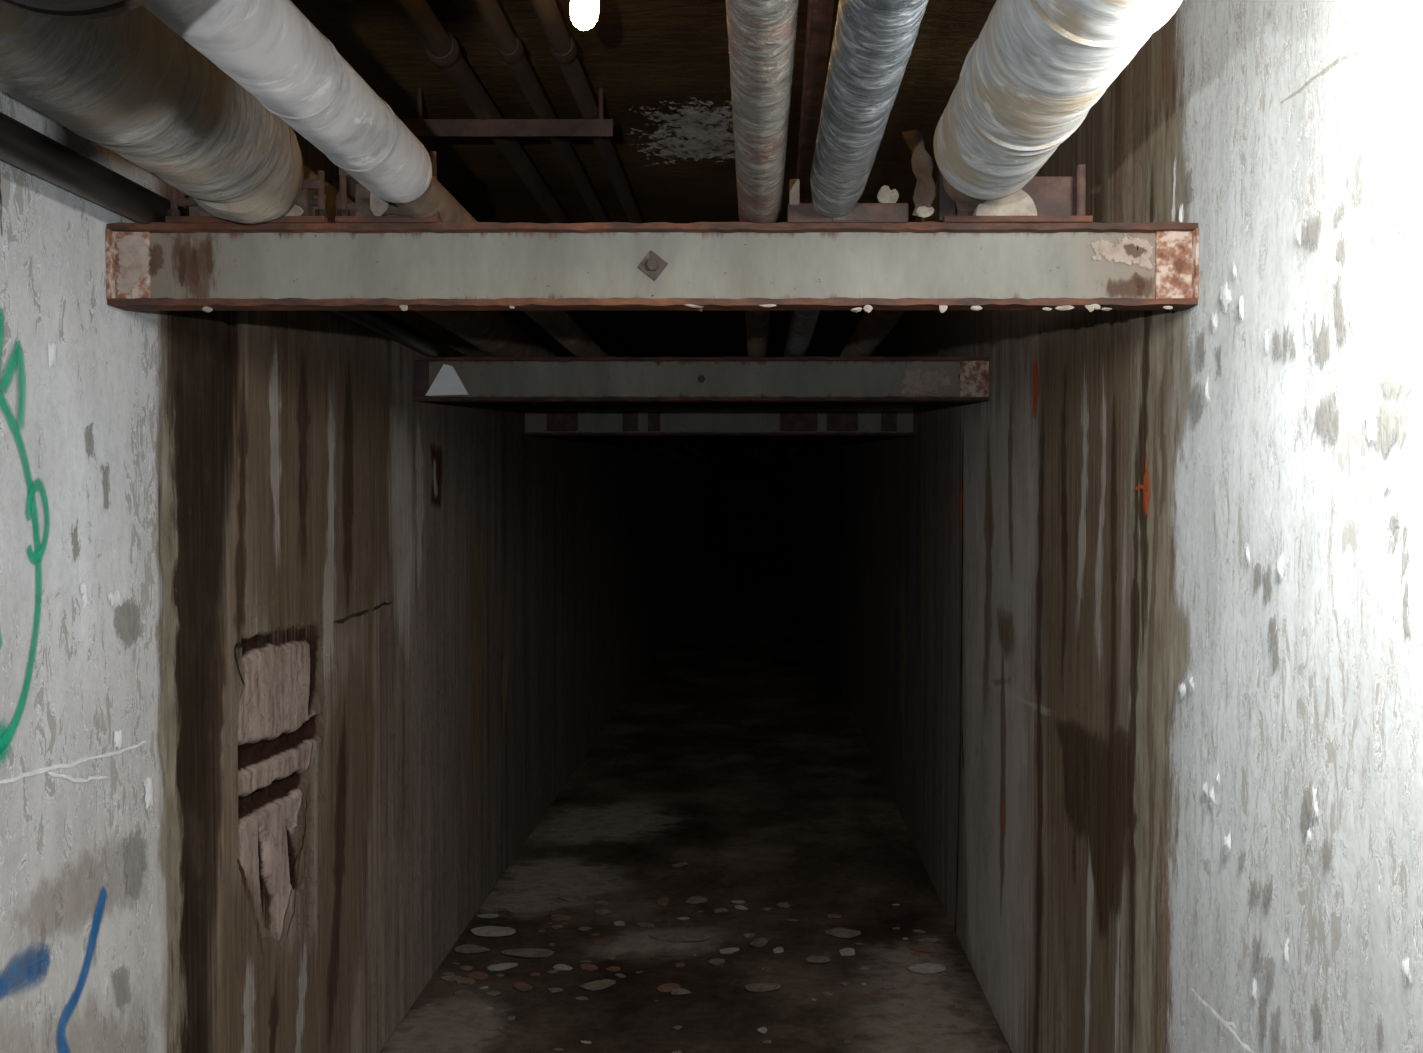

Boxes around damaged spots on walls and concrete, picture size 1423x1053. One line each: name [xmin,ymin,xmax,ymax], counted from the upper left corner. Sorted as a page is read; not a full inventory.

leakage [1143,101,1188,223]
corrosion [172,235,215,299]
corrosion [1108,273,1152,298]
peeling [1306,386,1343,443]
peeling [1364,359,1416,642]
peeling [1245,544,1284,671]
leakage [957,310,1191,1053]
spalling [234,590,392,991]
peeling [1224,831,1276,908]
peeling [1300,783,1333,869]
peeling [1251,932,1289,1053]
peeling [1310,998,1323,1041]